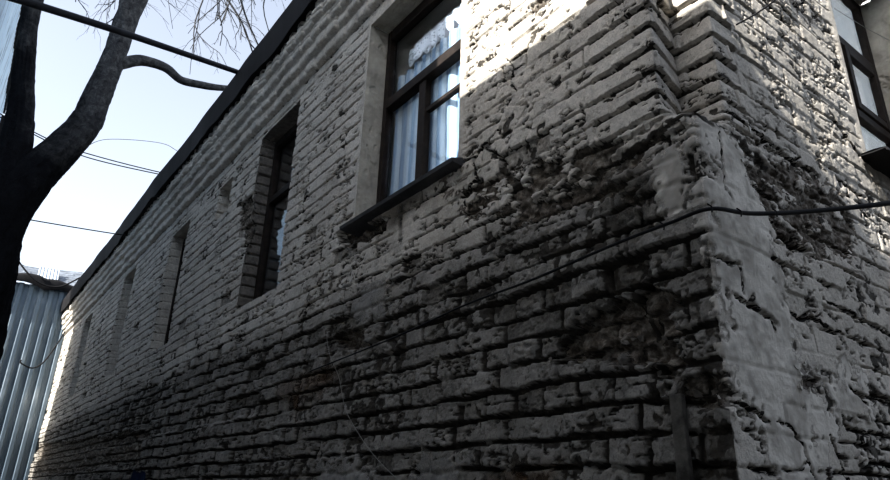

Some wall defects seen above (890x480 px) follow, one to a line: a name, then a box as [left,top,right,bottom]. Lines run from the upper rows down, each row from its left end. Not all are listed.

spalling [732,124,858,269]